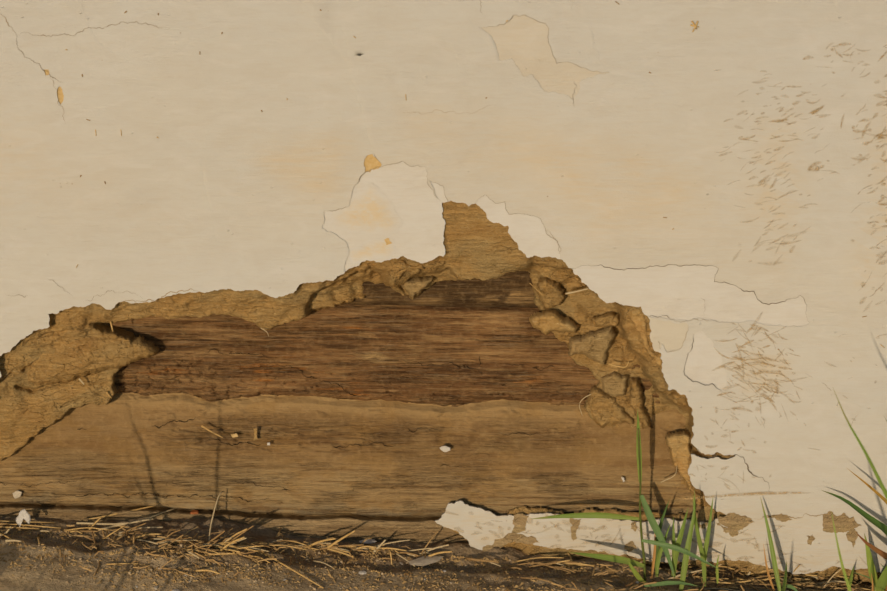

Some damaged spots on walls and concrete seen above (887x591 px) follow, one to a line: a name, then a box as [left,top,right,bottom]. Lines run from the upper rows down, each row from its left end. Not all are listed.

crack [1,14,164,123]
crack [582,264,809,322]
spalling [0,154,809,508]
crack [647,299,715,386]
flaking render [16,509,31,527]
spalling [482,513,538,551]
spalling [569,518,581,541]
spalling [624,522,638,553]
spalling [694,512,792,537]